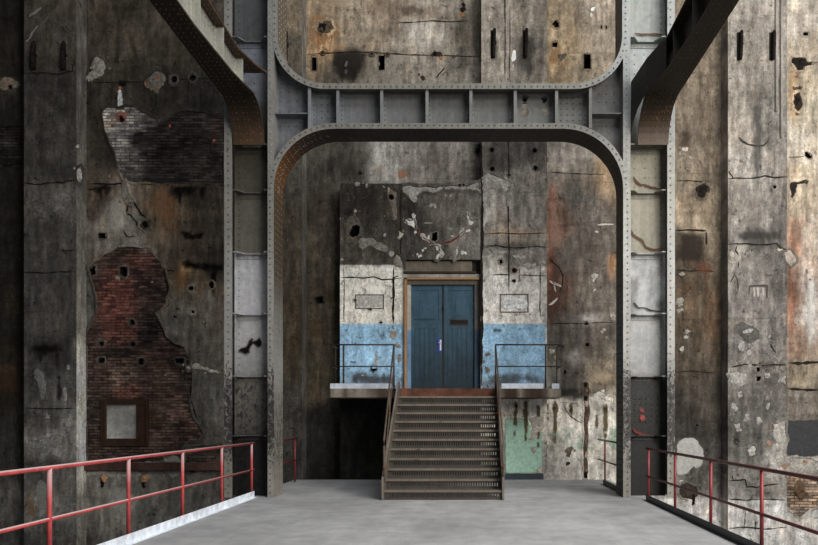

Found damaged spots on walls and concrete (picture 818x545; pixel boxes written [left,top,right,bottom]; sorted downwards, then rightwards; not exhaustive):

flaking render [86,54,111,85]
damp [334,52,365,79]
flaking render [100,86,224,208]
crack [123,189,145,237]
flaking render [340,170,518,271]
flaking render [85,232,224,476]
flaking render [726,319,818,521]